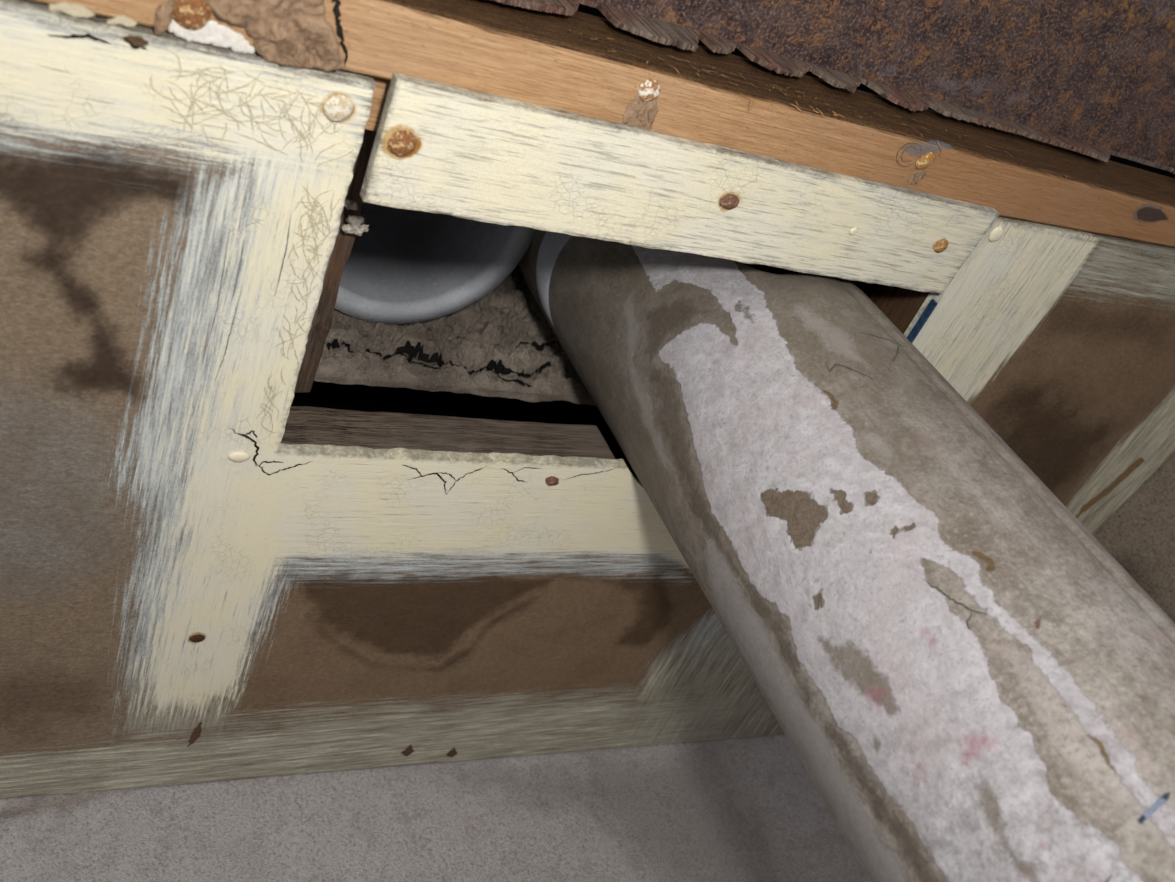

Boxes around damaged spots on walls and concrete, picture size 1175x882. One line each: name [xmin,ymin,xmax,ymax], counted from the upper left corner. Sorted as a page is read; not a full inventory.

peeling [169,17,255,53]
crack [332,0,348,65]
crack [47,33,563,476]
crack [403,465,615,494]
spalling [761,489,852,548]
spalling [866,493,878,505]
peeling [1076,458,1144,518]
damp [632,245,1175,882]
spalling [814,593,822,610]